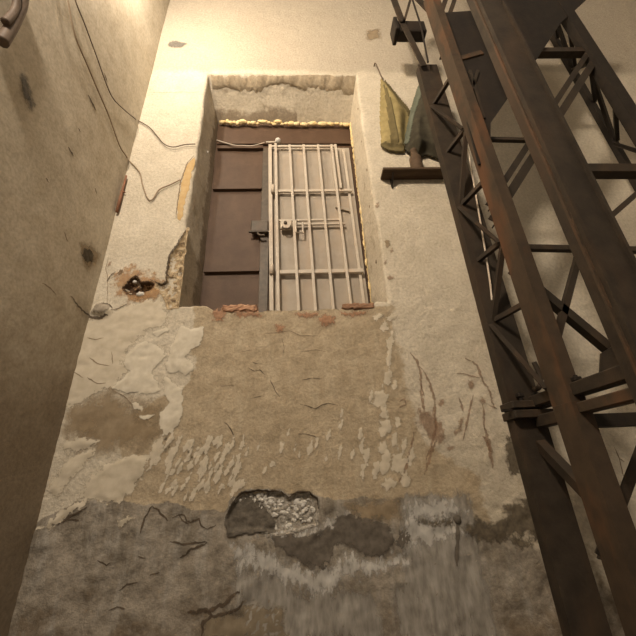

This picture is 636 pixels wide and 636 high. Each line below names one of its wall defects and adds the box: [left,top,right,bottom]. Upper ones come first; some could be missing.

damp [65,389,161,451]
peeling [36,227,319,537]
peeling [293,310,415,492]
corrosion [411,354,444,475]
corrosion [454,398,473,440]
corrosion [457,358,497,468]
crack [140,506,216,558]
damp [230,497,537,598]
crack [187,591,286,636]